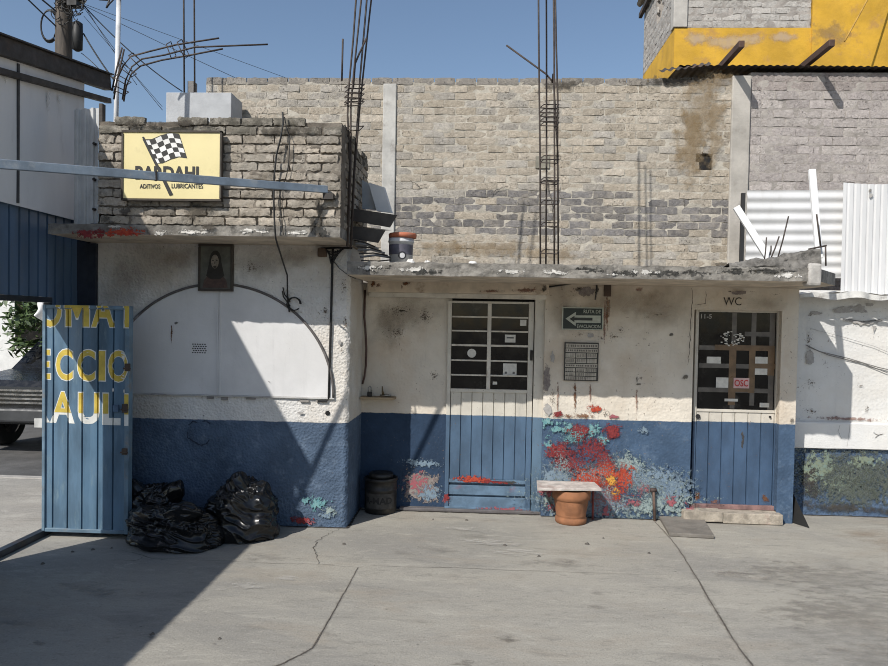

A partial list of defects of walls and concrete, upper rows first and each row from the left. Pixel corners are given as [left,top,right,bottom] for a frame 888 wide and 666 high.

crack [276,507,376,666]
flaking render [397,457,451,504]
crack [396,508,537,516]
peeling [453,341,722,519]
crack [587,517,753,666]